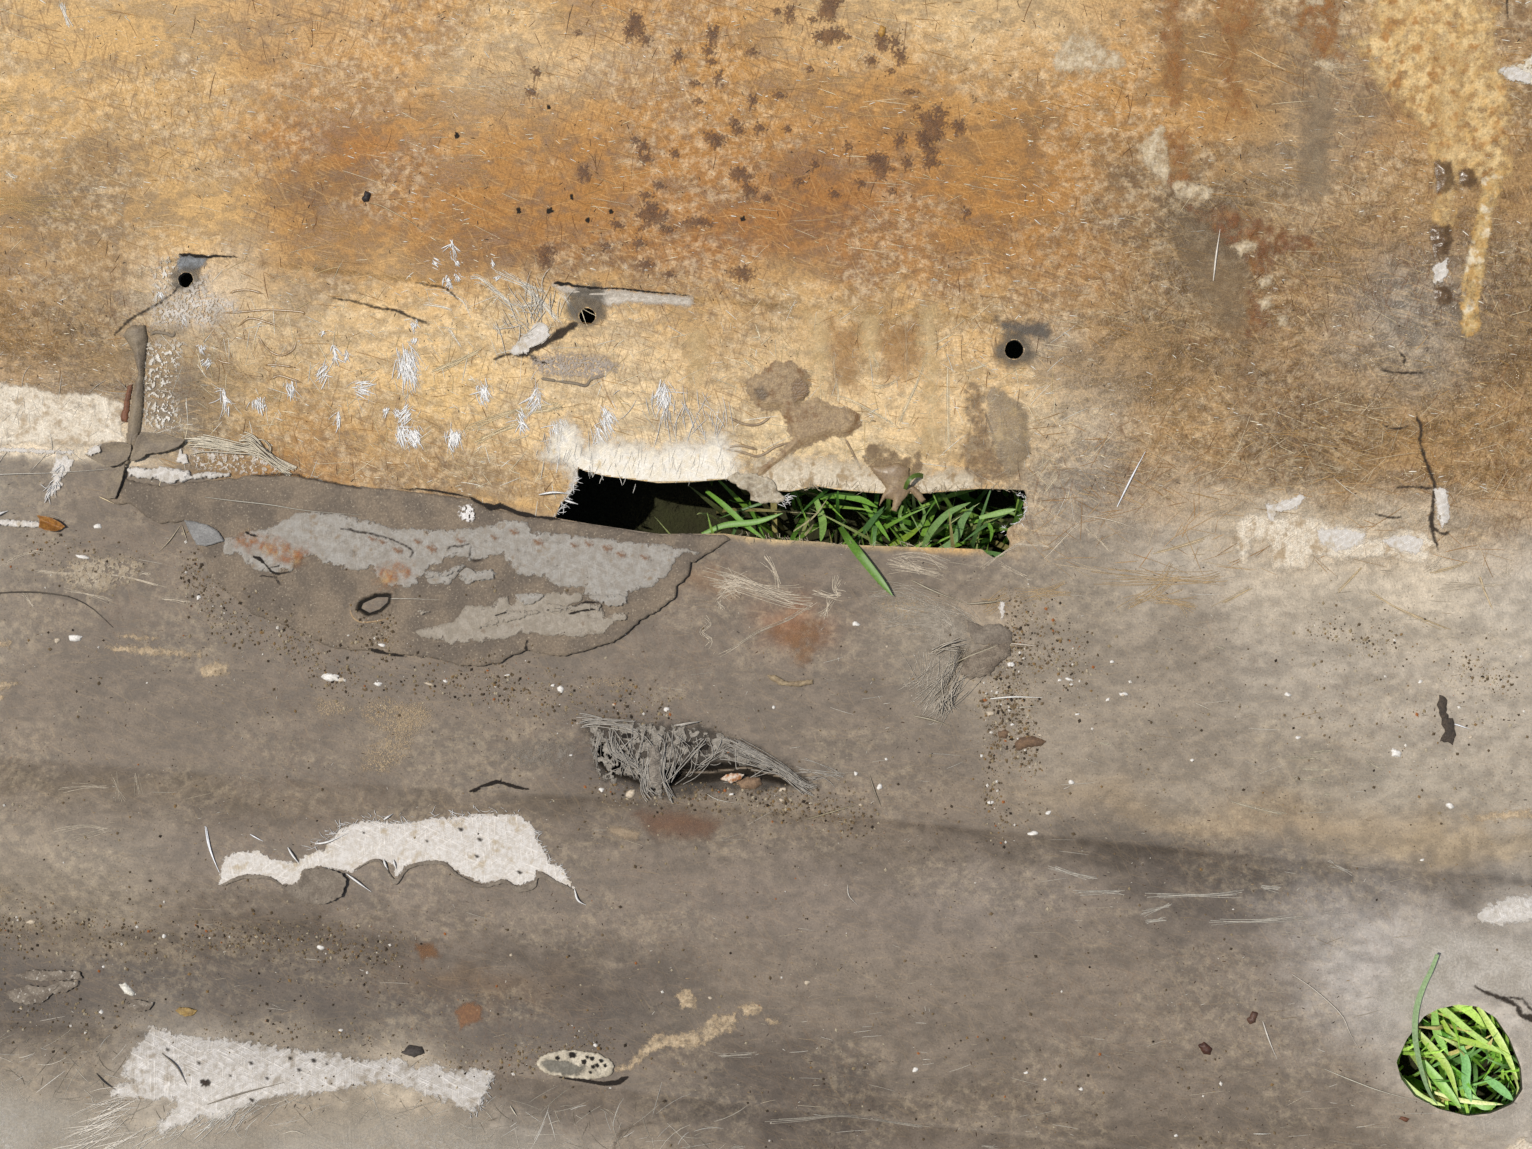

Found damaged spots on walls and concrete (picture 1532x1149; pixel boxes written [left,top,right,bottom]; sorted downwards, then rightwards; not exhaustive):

rust [622,9,654,47]
rust [671,23,725,105]
rust [772,0,851,45]
rust [864,29,908,75]
rust [599,133,714,278]
rust [703,91,791,151]
rust [842,89,967,197]
damp [1314,0,1513,338]
peeling [175,447,189,464]
spalling [909,467,980,493]
peeling [110,475,730,686]
spalling [576,704,858,803]